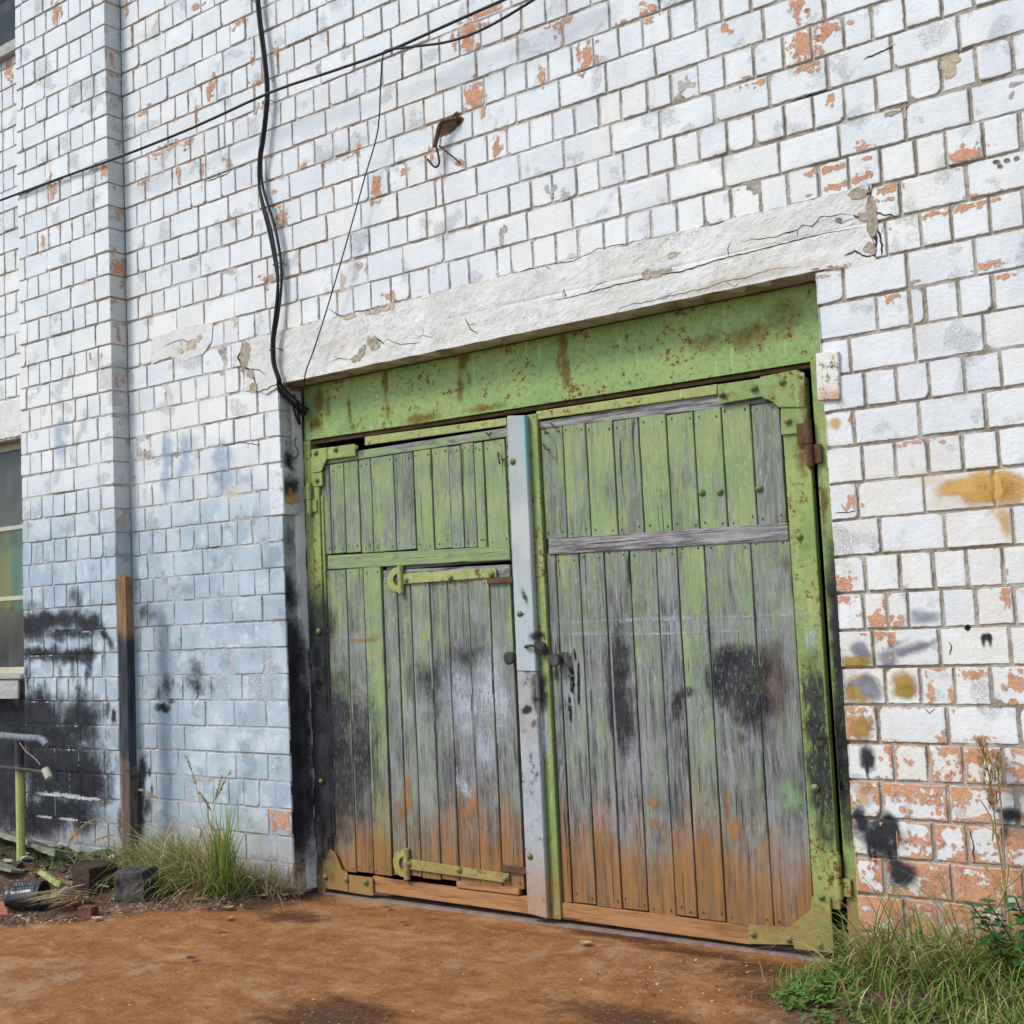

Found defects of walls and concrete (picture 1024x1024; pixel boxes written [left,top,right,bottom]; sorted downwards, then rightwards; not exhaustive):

peeling [785,0,854,74]
peeling [946,136,1019,173]
spalling [803,139,905,255]
crack [505,183,897,317]
spalling [240,337,258,393]
crack [237,352,277,391]
corrosion [558,335,570,384]
leakage [285,573,297,608]
peeling [836,570,905,660]
leakage [77,623,113,703]
peeling [1001,662,1024,705]
peeling [844,707,1024,944]